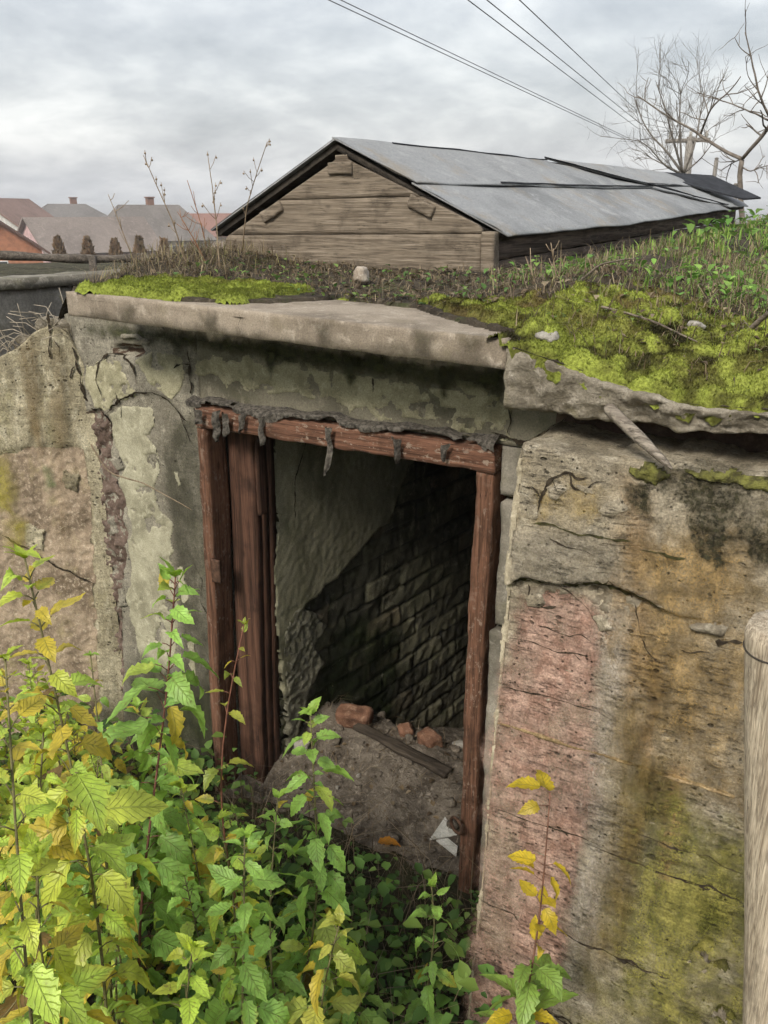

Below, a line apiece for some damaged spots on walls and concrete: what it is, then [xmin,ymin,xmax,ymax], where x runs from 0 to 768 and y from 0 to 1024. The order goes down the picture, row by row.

crack [46,313,193,440]
spalling [0,334,512,755]
crack [525,471,685,560]
crack [513,577,742,663]
water stain [644,549,741,743]